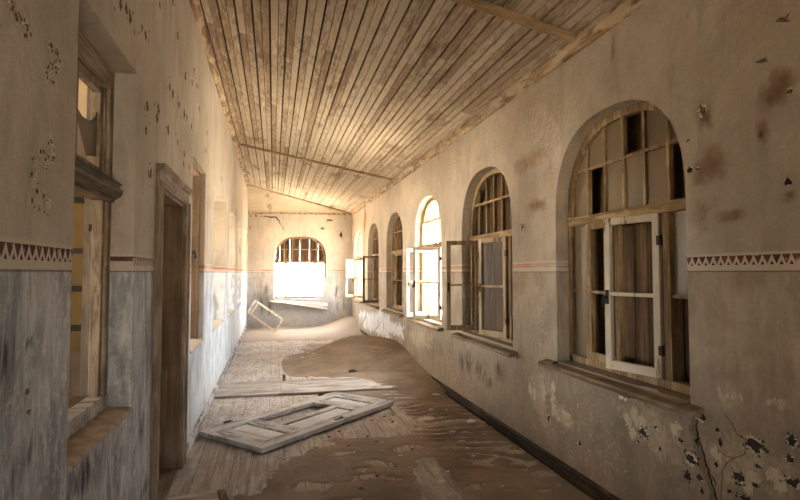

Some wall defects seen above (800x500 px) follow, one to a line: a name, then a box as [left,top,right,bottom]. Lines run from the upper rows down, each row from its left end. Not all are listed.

flaking render [144,101,191,172]
damp [686,51,800,250]
peeling [354,305,443,357]
peeling [603,377,800,500]
crack [686,414,746,500]